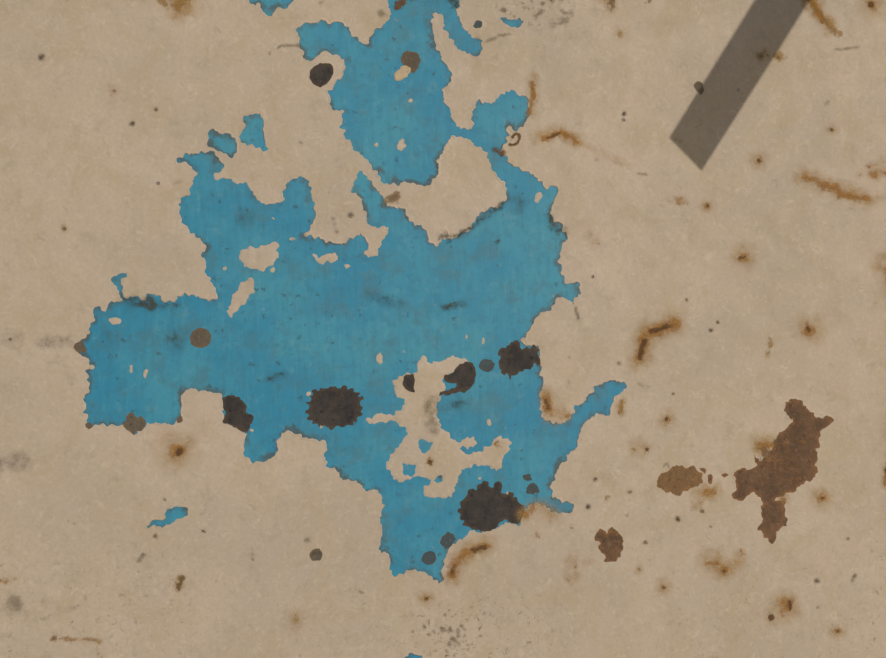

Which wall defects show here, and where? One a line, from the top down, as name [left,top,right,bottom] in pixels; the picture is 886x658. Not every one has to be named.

rust [804,0,843,35]
rust [802,172,870,202]
peeling [72,0,628,585]